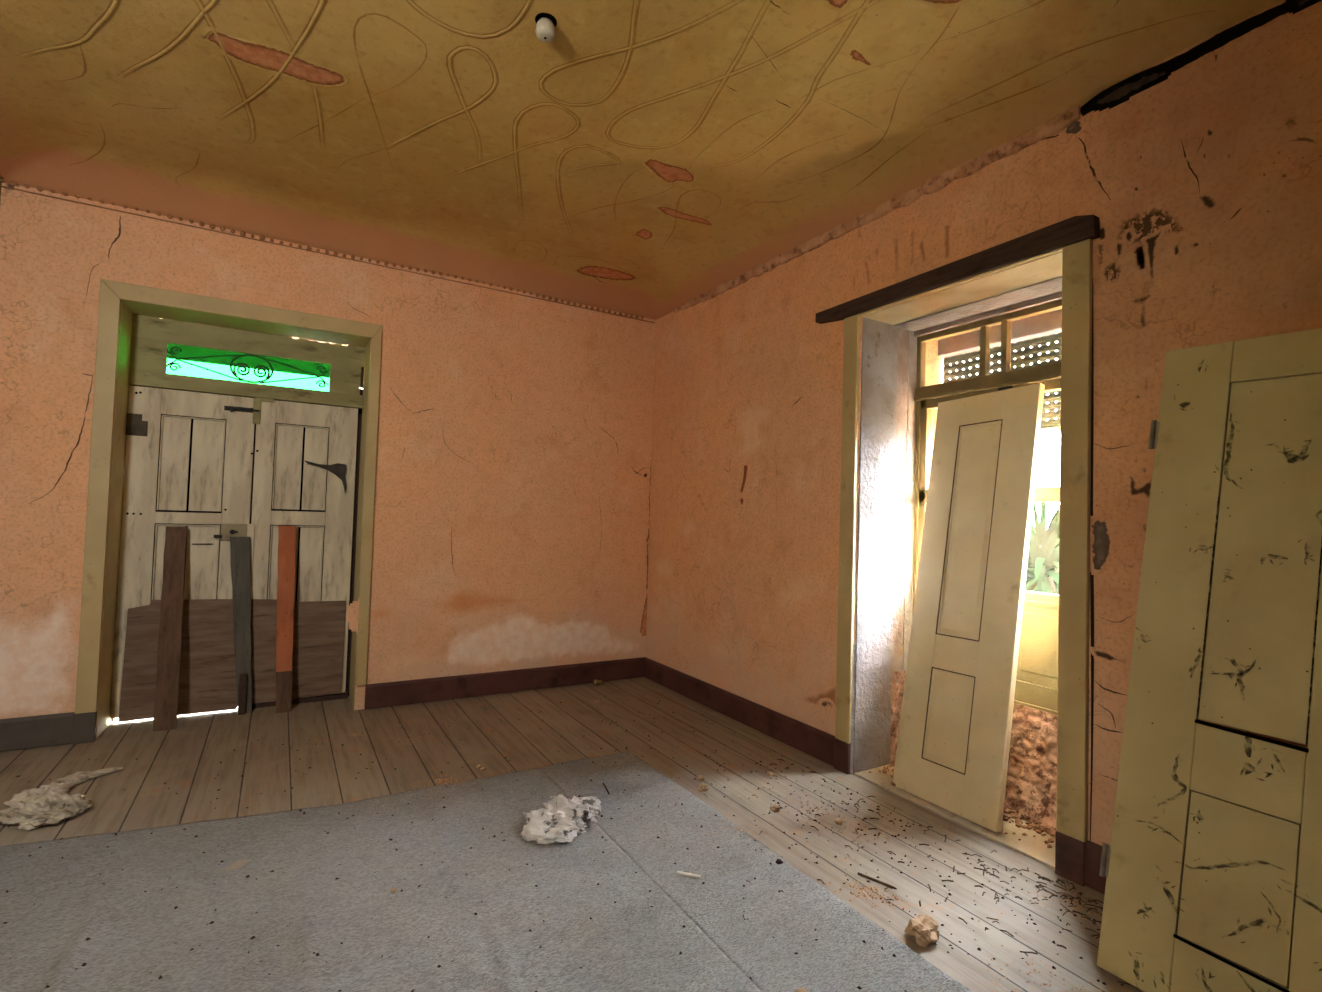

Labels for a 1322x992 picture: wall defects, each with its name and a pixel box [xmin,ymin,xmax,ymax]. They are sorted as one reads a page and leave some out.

peeling [197,26,353,90]
peeling [641,157,699,185]
water stain [347,576,646,684]